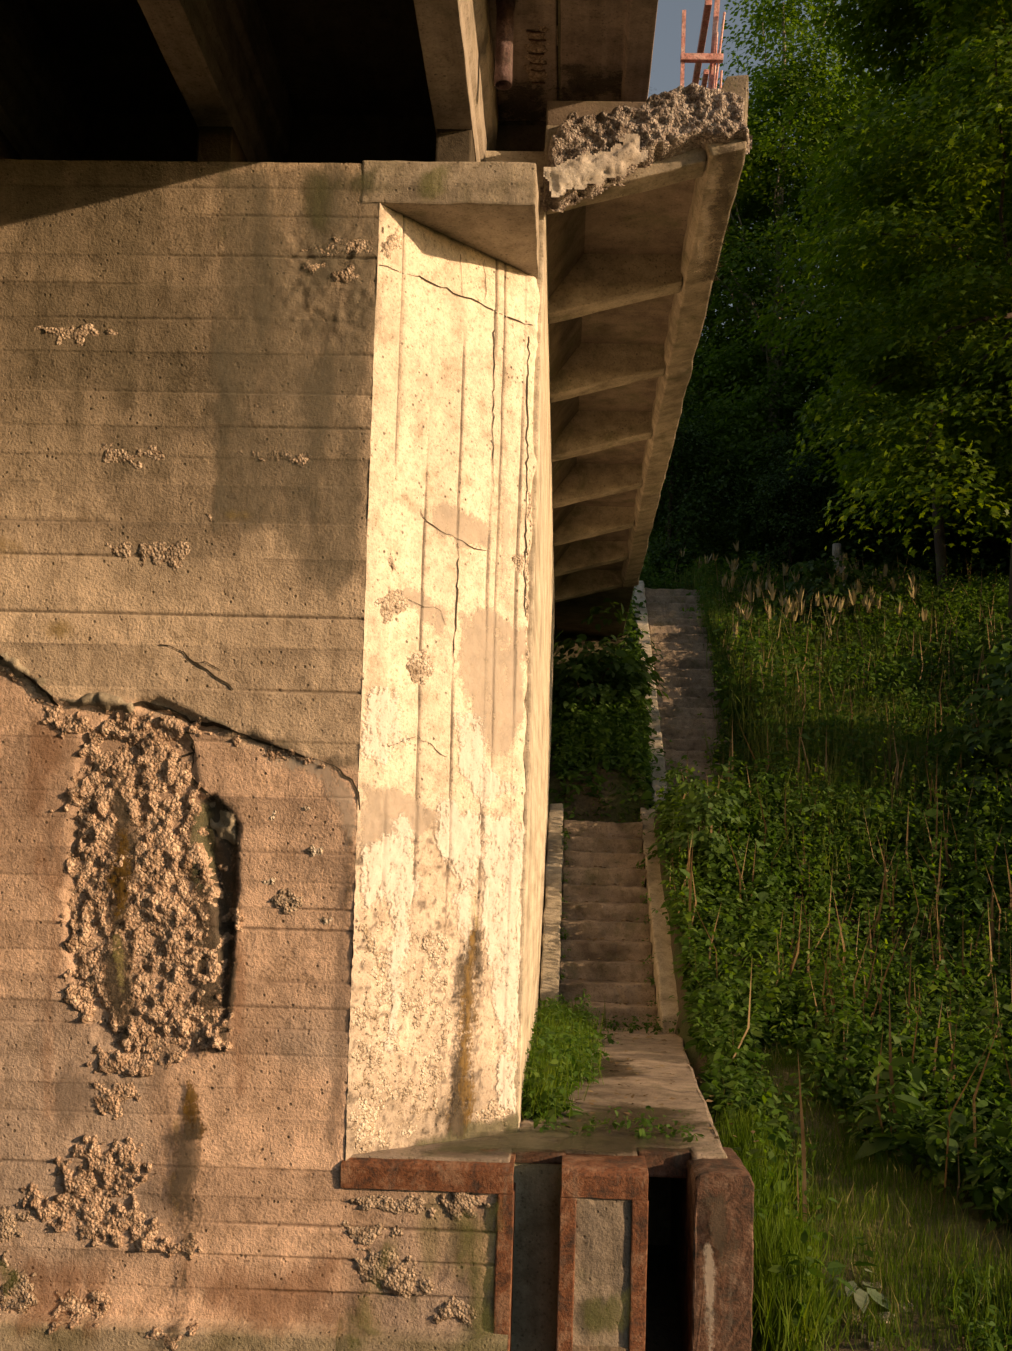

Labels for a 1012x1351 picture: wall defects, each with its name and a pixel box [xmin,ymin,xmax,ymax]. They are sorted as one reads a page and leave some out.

spalling [33,320,118,347]
spalling [100,442,165,469]
crack [381,254,532,611]
spalling [105,540,191,574]
leakage [433,502,489,549]
crack [0,652,360,825]
crack [159,644,233,690]
leakage [401,589,527,754]
leakage [349,786,465,849]
spalling [37,705,245,1121]
spalling [0,1134,203,1335]
spalling [340,1192,497,1327]